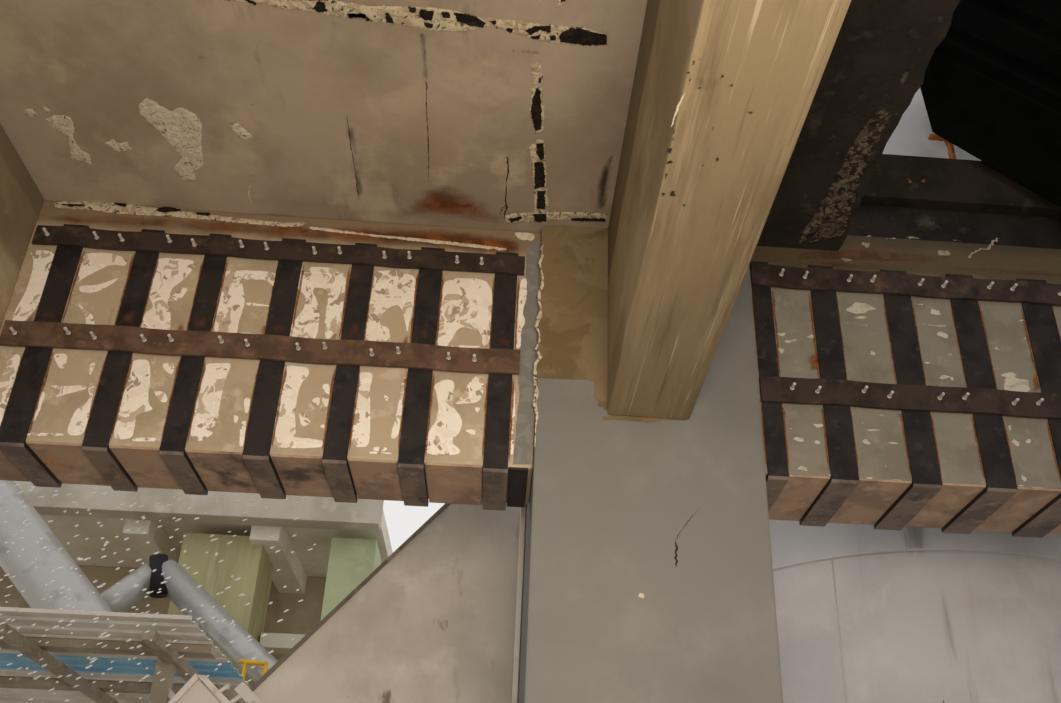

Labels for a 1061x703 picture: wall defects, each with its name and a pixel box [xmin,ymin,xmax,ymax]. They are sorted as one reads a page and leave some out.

crack [347,116,359,195]
crack [423,82,431,176]
corrosion [422,192,476,213]
crack [500,157,509,218]
peeling [290,267,346,339]
peeling [365,270,416,342]
peeling [438,278,493,348]
peeling [114,359,174,441]
peeling [191,363,231,441]
peeling [272,366,330,448]
peeling [351,372,406,454]
crack [674,510,698,567]